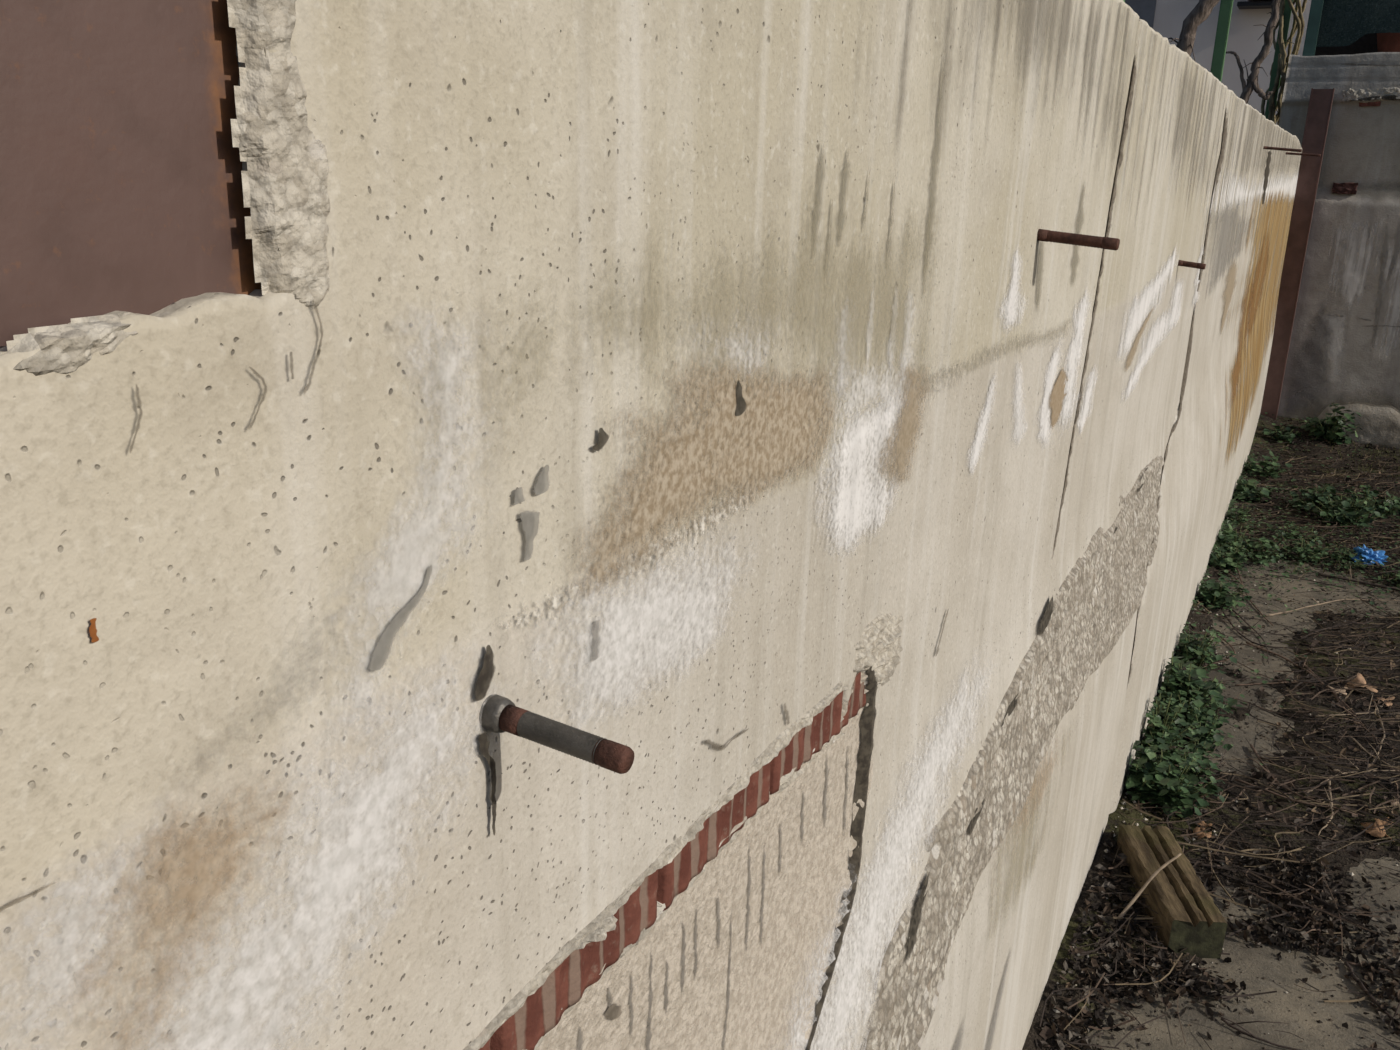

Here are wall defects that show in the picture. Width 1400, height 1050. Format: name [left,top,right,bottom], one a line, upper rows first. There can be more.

spalling [0,312,138,376]
spalling [227,0,330,309]
peeling [463,613,903,1050]
water stain [557,291,929,718]
crack [806,666,877,1050]
water stain [969,380,995,472]
spalling [860,456,1164,1050]
water stain [1014,293,1096,446]
crack [1053,57,1137,552]
crack [1127,606,1140,684]
crack [1147,108,1228,565]
water stain [1117,64,1301,397]